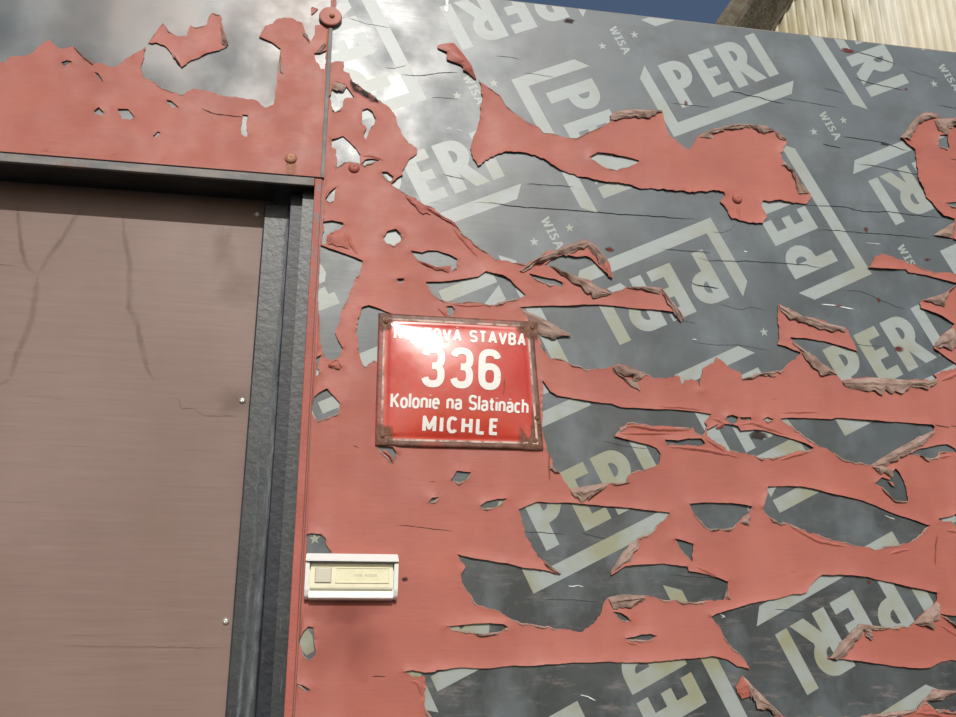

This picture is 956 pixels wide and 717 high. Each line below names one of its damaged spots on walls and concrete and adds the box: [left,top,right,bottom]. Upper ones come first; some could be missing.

peeling [0,0,956,395]
peeling [312,389,340,422]
peeling [377,446,396,464]
peeling [306,533,331,554]
peeling [405,382,956,717]
peeling [299,626,316,661]